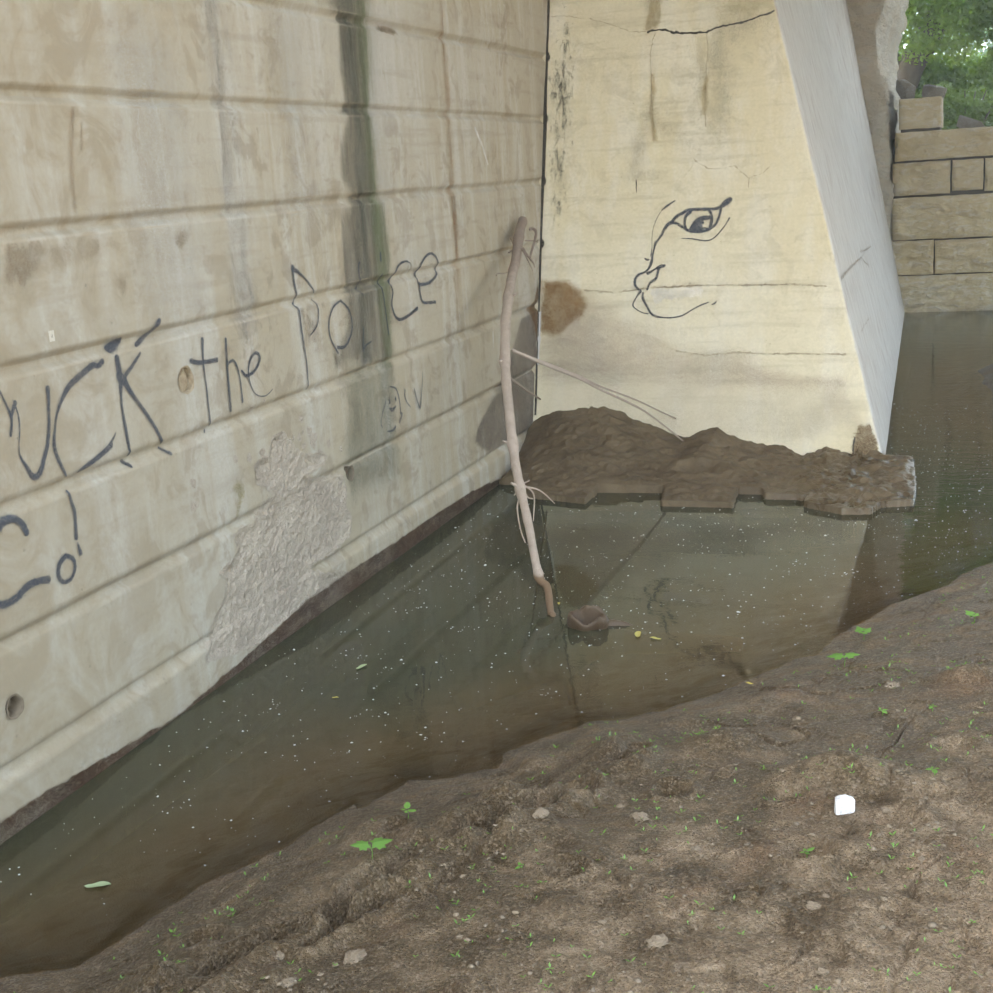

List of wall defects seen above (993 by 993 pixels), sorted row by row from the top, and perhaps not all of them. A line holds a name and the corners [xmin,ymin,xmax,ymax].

mould [546,23,575,228]
crack [551,10,775,127]
water stain [336,0,401,505]
spalling [204,415,353,664]